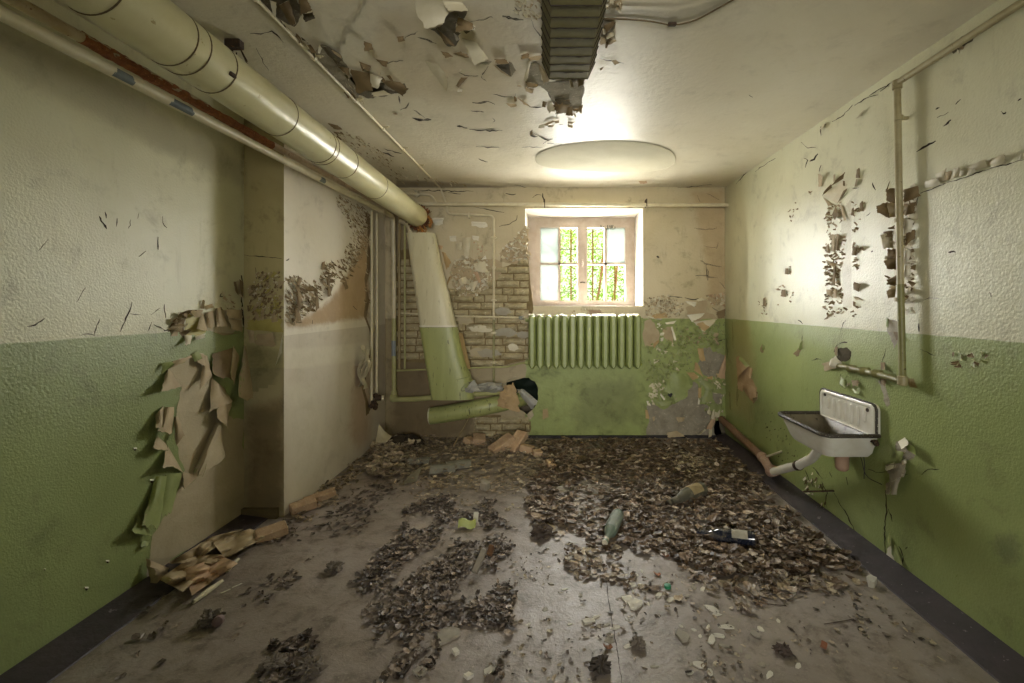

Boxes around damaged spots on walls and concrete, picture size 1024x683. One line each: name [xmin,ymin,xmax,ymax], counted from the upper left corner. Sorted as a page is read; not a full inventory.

peeling [261,0,409,115]
peeling [413,0,585,117]
peeling [600,0,623,48]
peeling [132,195,371,583]
flaking render [396,249,425,363]
flaking render [438,218,543,437]
peeling [642,292,758,438]
peeling [808,152,1024,434]